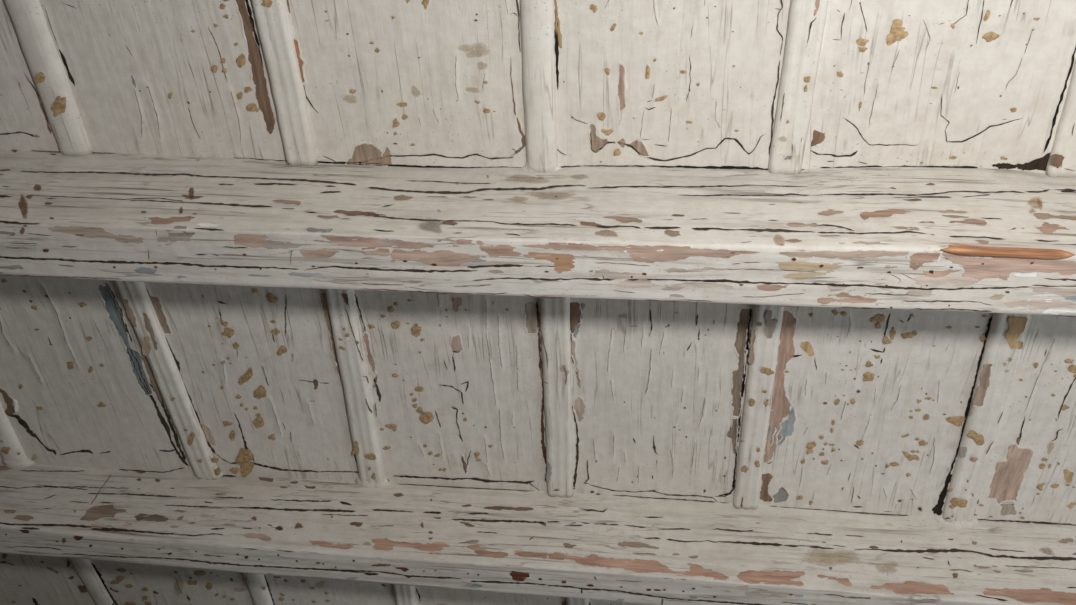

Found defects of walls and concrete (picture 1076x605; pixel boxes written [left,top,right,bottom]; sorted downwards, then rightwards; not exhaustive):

peeling [233,0,277,140]
crack [573,26,785,161]
crack [941,72,1022,143]
peeling [234,210,760,297]
peeling [757,209,1076,349]
peeling [860,198,987,230]
crack [0,147,1076,605]
peeling [725,306,814,504]
peeling [932,474,952,516]
peeling [985,437,1035,517]
peeling [467,536,852,598]
peeling [982,588,1076,605]